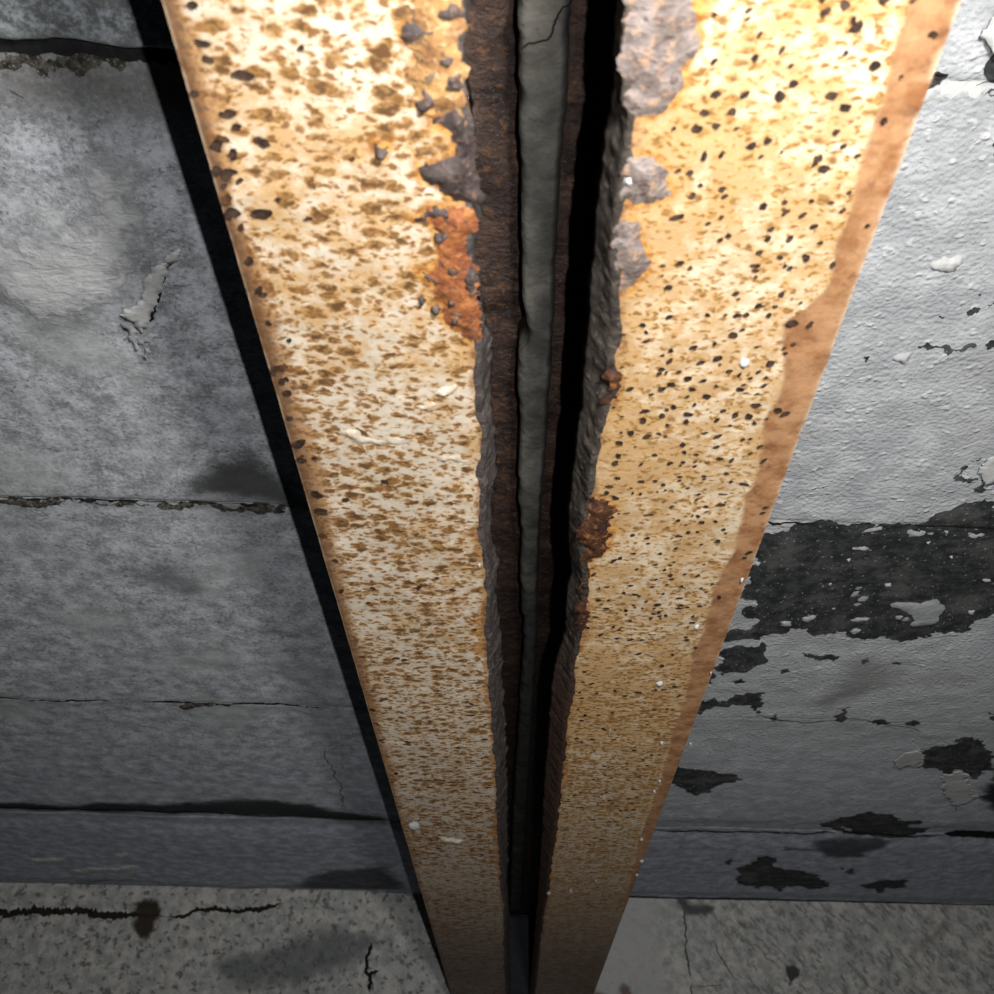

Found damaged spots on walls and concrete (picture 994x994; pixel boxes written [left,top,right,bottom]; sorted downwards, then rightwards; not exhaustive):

crack [522,0,573,48]
crack [0,38,180,98]
peeling [922,16,994,105]
crack [0,496,293,514]
peeling [697,456,994,723]
crack [0,748,391,821]
peeling [672,764,743,796]
peeling [894,737,994,810]
peeling [819,811,930,838]
peeling [725,856,830,892]
crack [0,884,284,921]
rust [133,899,160,939]